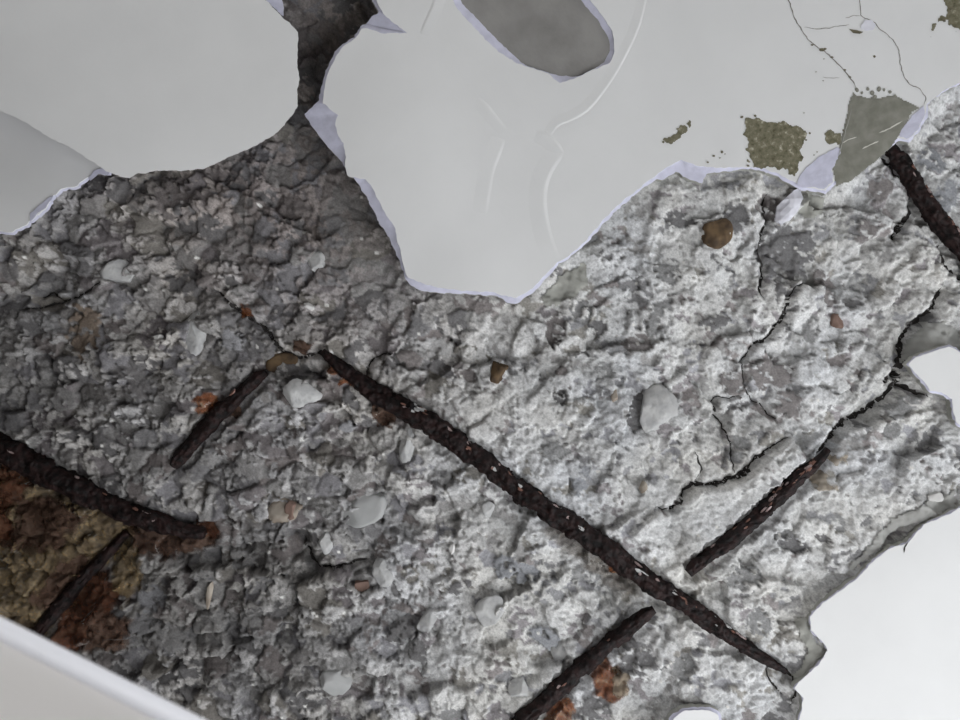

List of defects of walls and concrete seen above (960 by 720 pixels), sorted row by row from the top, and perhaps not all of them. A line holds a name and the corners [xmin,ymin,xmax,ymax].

peeling [461,0,610,77]
crack [788,0,926,104]
peeling [0,110,112,235]
crack [880,157,911,240]
spalling [885,86,960,262]
corrosion [193,393,227,414]
corrosion [293,340,313,355]
corrosion [371,404,396,429]
crack [658,283,802,510]
crack [816,245,960,454]
corrosion [0,464,221,654]
spalling [318,349,788,674]